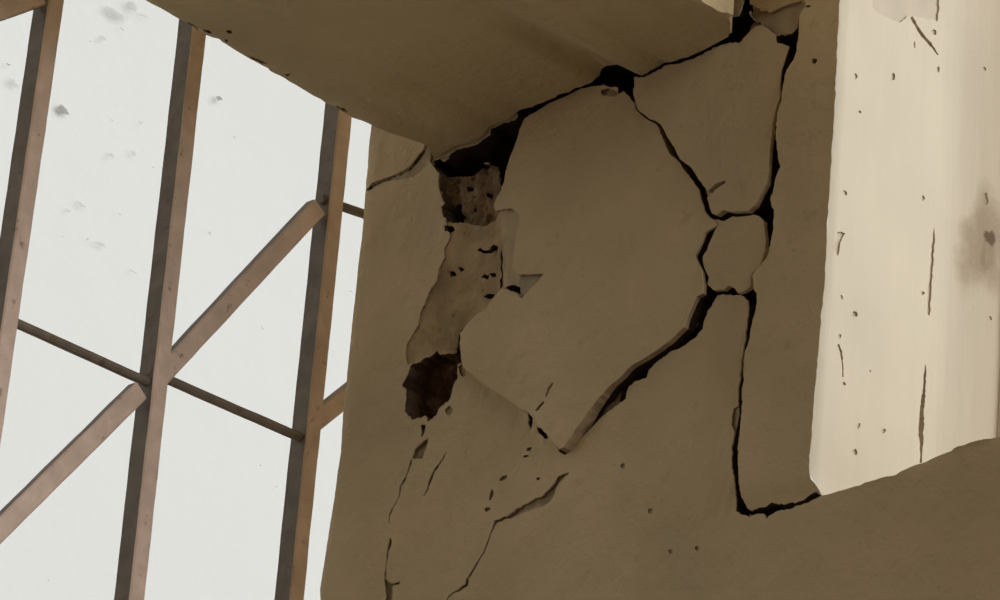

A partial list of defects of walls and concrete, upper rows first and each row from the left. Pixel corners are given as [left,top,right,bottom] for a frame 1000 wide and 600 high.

crack [516,0,806,127]
crack [911,16,939,55]
crack [367,145,439,191]
spalling [401,117,542,422]
crack [927,231,935,316]
crack [528,413,567,455]
crack [599,390,627,419]
crack [731,295,821,519]
crack [918,365,926,463]
crack [384,405,453,600]